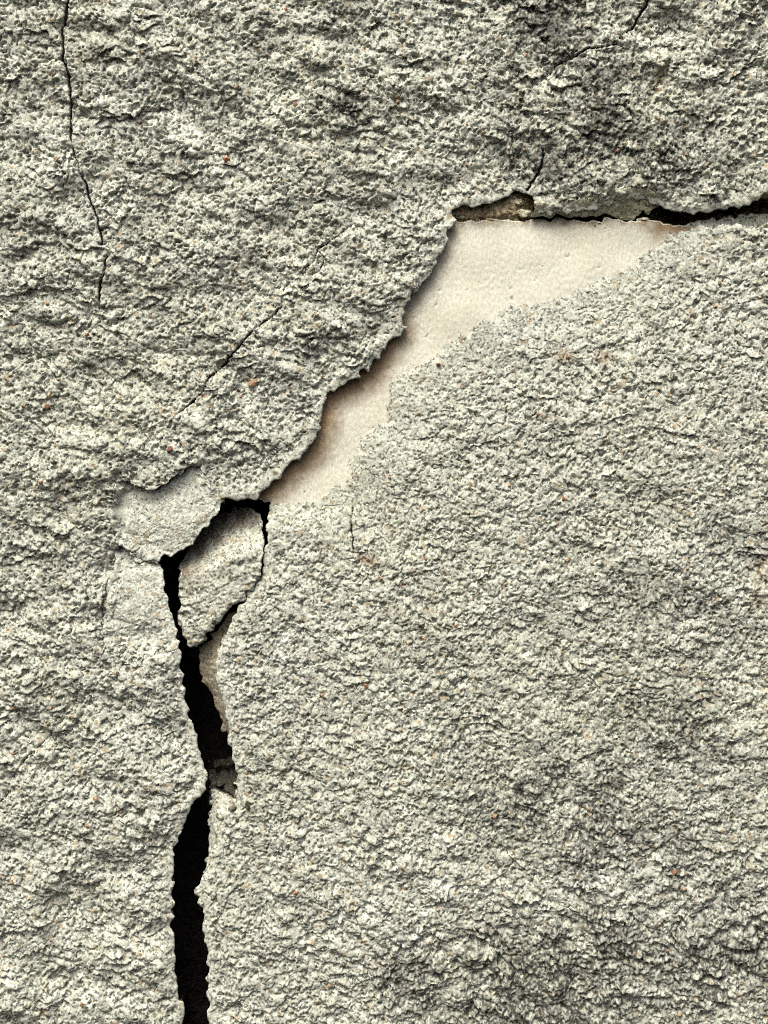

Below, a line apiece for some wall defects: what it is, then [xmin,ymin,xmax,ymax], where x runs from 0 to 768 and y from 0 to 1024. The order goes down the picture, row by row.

crack [61,0,112,306]
crack [179,235,339,413]
spalling [259,217,691,506]
crack [554,0,649,68]
crack [451,150,768,226]
crack [159,498,271,1024]